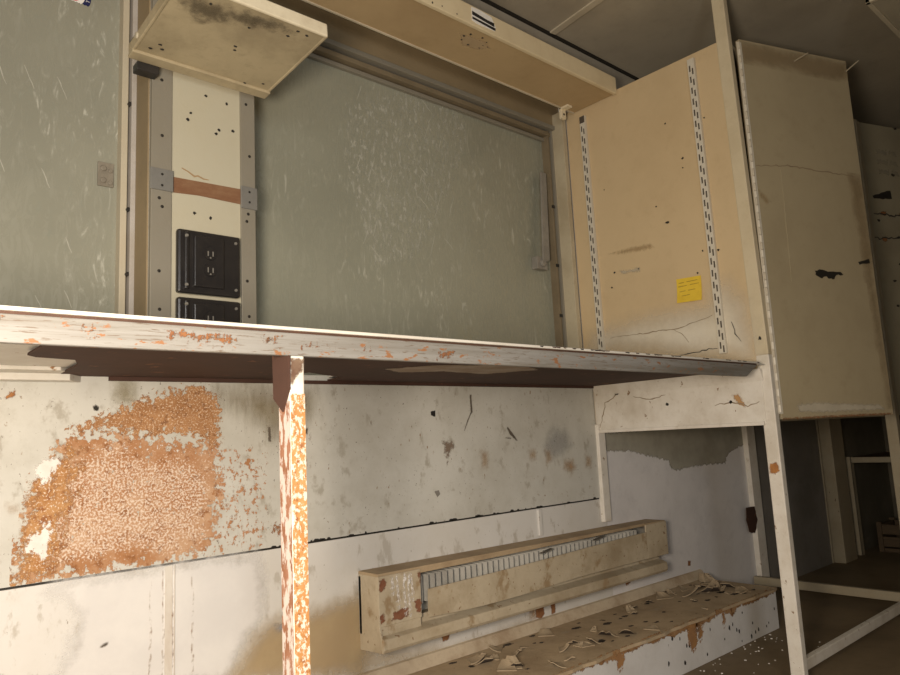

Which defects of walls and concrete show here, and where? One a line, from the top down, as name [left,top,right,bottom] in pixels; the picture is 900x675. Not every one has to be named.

peeling [605,426,743,471]